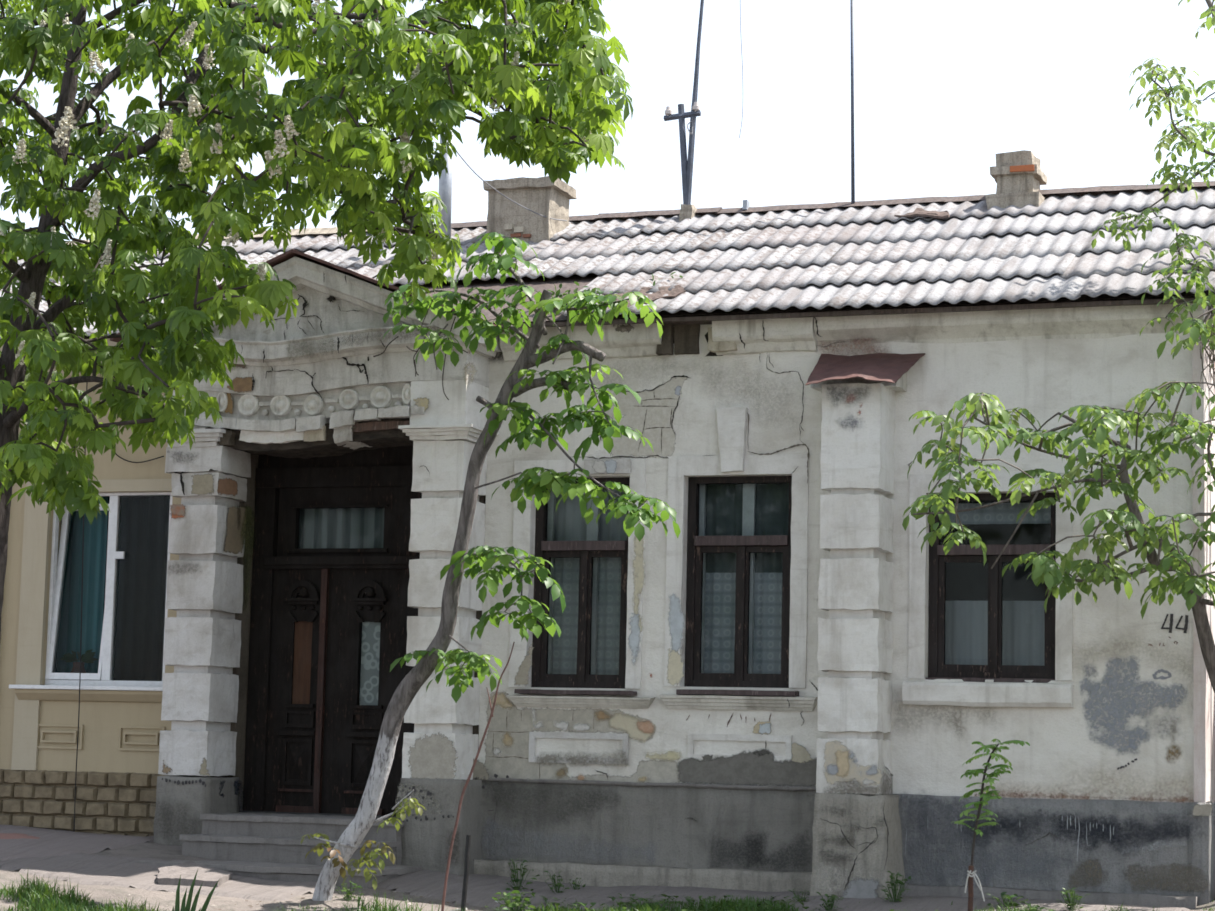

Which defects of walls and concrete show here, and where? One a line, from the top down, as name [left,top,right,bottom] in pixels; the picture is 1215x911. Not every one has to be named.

crack [241,270,369,401]
flaking render [224,363,253,414]
crack [739,322,810,483]
peeling [633,536,645,632]
peeling [667,594,684,685]
peeling [473,644,680,783]
peeling [396,732,458,815]
peeling [791,740,883,786]
crack [820,767,893,889]
water stain [1062,815,1114,860]